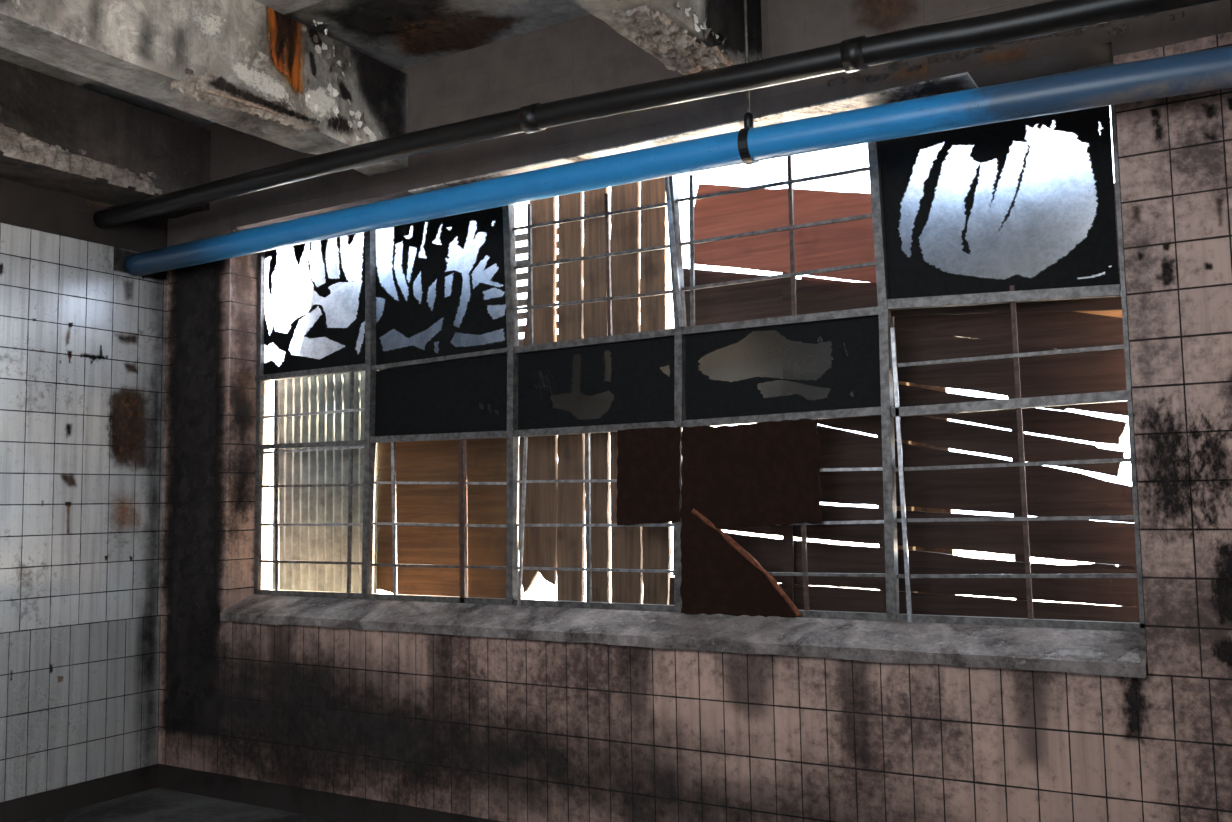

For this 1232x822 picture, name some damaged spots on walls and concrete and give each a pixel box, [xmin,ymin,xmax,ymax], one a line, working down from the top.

spalling [169,68,321,132]
corrosion [267,7,303,94]
peeling [313,20,382,142]
water stain [1156,244,1175,286]
water stain [118,335,137,343]
water stain [109,389,148,467]
water stain [1212,544,1232,667]